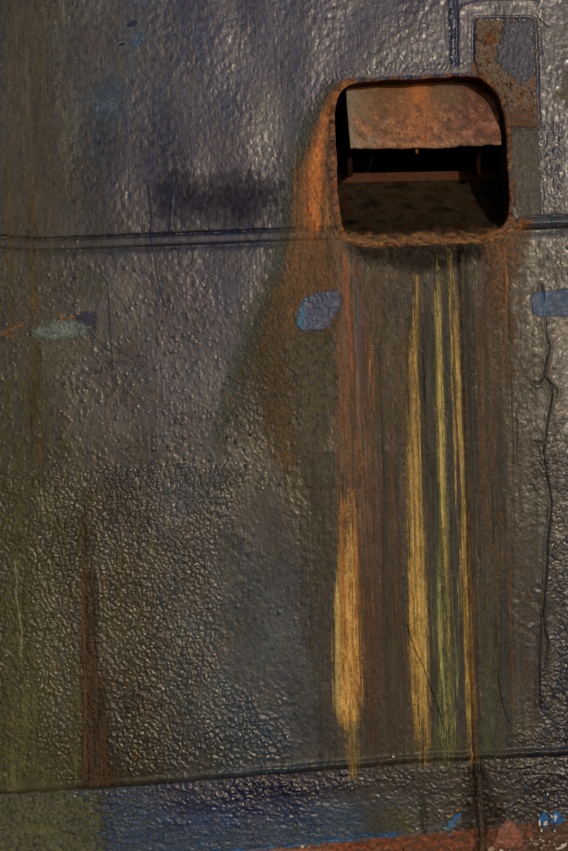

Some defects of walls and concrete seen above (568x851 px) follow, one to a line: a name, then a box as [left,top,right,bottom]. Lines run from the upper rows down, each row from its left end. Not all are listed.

corrosion [216,99,381,645]
crack [516,339,558,702]
peeling [526,809,568,851]